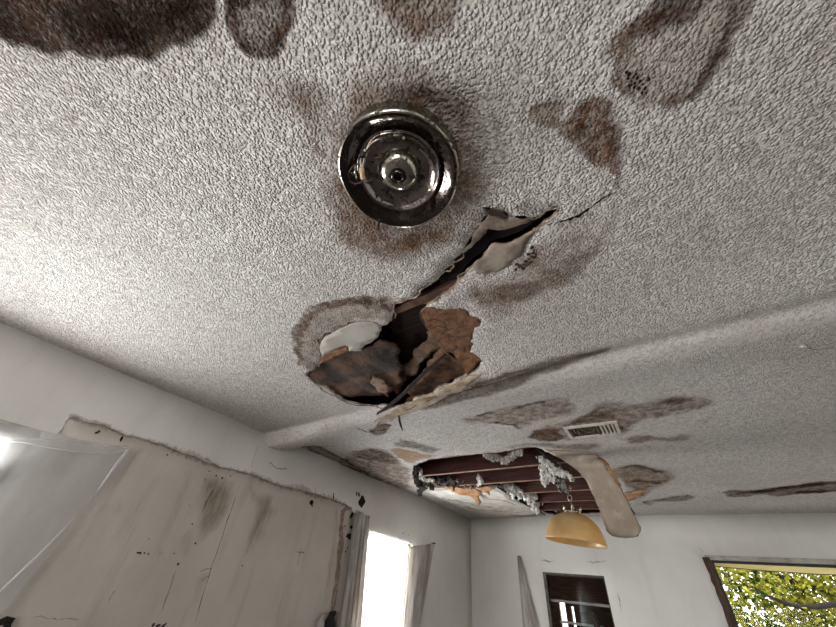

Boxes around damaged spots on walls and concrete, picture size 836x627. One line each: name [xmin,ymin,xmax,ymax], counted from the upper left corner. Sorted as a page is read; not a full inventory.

water stain [0,0,295,60]
water stain [613,71,650,94]
water stain [608,0,700,60]
water stain [690,1,740,99]
water stain [336,88,479,254]
water stain [533,97,620,173]
crack [440,192,616,297]
spalling [307,283,482,435]
water stain [467,398,708,449]
peeling [0,417,366,627]
peeling [426,490,536,515]
water stain [724,481,836,497]